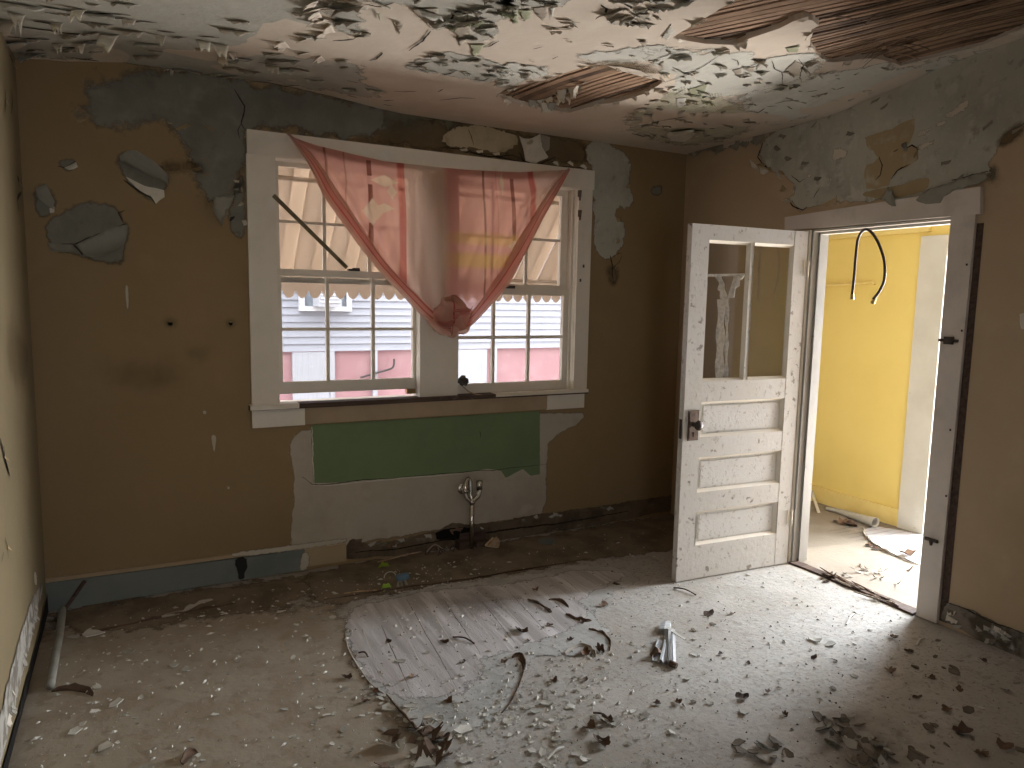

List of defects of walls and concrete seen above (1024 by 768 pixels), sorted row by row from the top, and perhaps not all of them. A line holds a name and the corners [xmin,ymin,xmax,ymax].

peeling [0,0,1024,238]
peeling [585,141,633,260]
peeling [46,201,129,264]
spalling [425,527,484,540]
flaking render [941,601,1024,659]